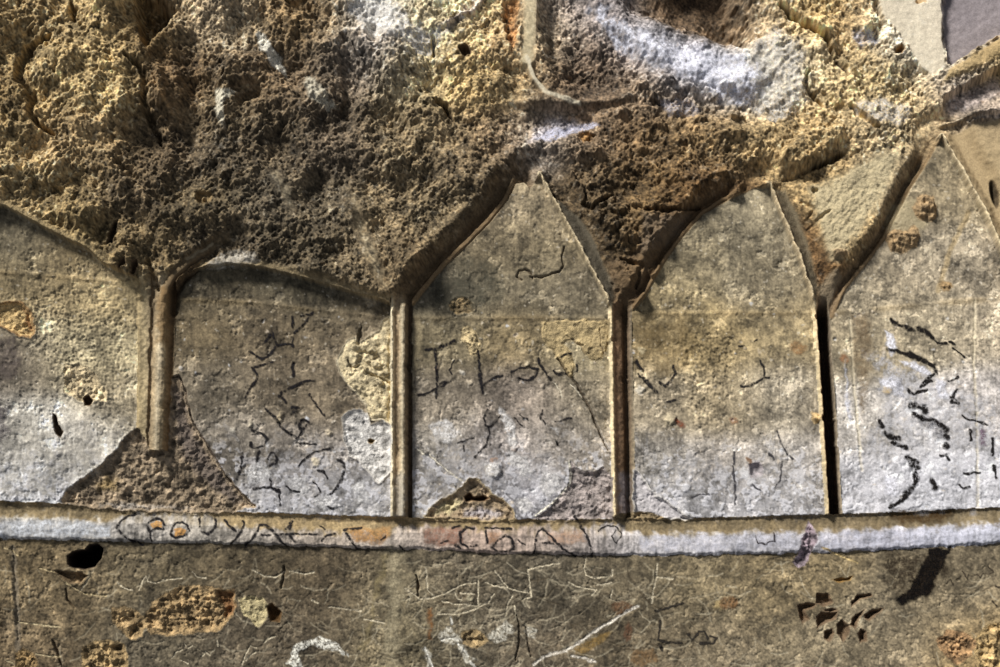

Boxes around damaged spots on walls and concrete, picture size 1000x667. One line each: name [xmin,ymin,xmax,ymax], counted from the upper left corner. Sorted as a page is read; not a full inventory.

spalling [130,0,181,50]
spalling [457,42,473,58]
water stain [597,6,805,119]
flaking render [173,65,265,113]
flaking render [505,103,606,152]
water stain [543,123,596,141]
water stain [856,99,909,124]
flaking render [0,301,36,339]
flaking render [336,312,393,484]
flaking render [58,374,258,516]
flaking render [424,478,516,523]
flaking render [80,584,284,667]